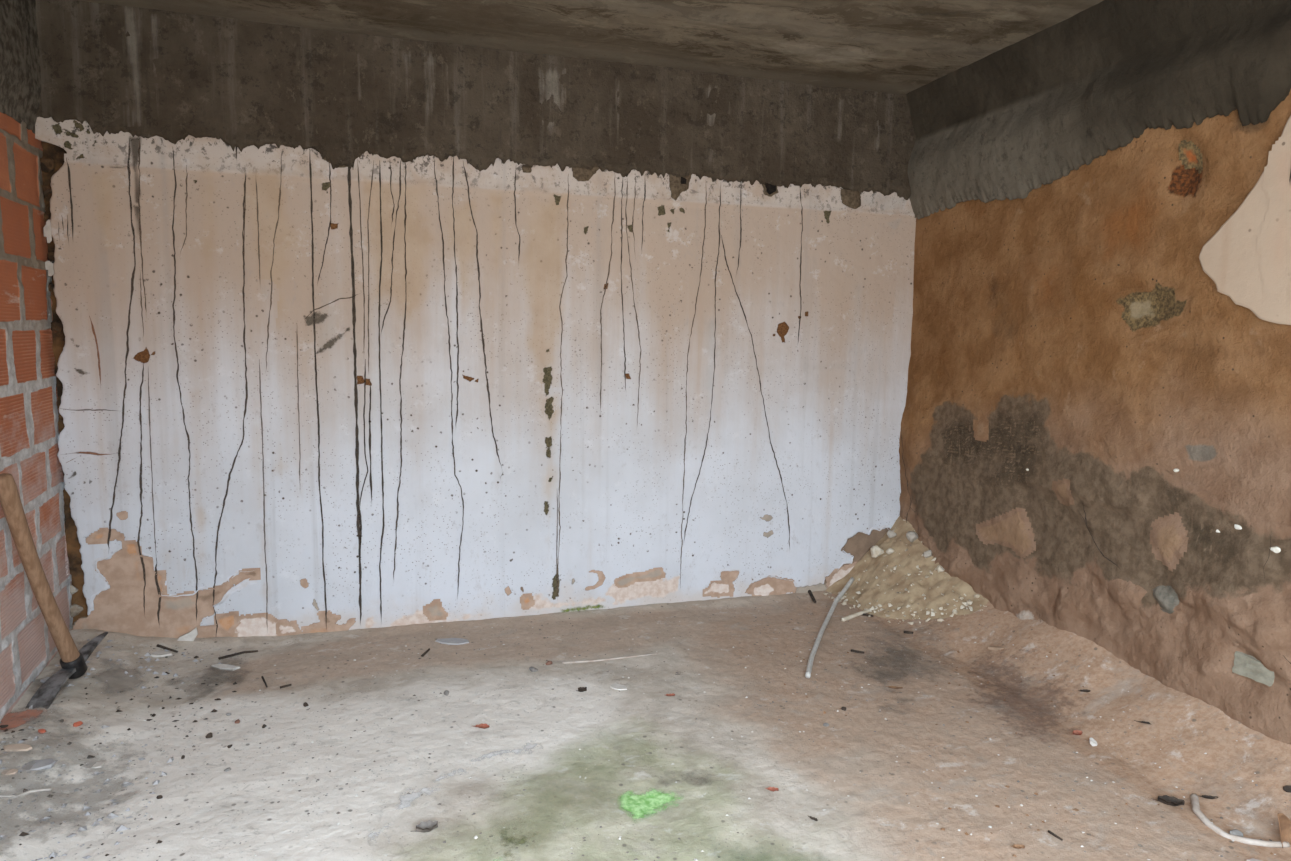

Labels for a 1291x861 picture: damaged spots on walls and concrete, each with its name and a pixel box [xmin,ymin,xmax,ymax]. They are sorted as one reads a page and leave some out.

spalling [35,136,67,434]
crack [66,139,283,634]
peeling [63,472,496,657]
crack [381,157,503,587]
crack [557,174,569,595]
peeling [505,564,684,615]
crack [600,178,646,423]
spalling [669,174,692,201]
crack [680,187,790,586]
peeling [703,525,890,598]
spalling [840,189,861,209]
water stain [905,386,1291,617]